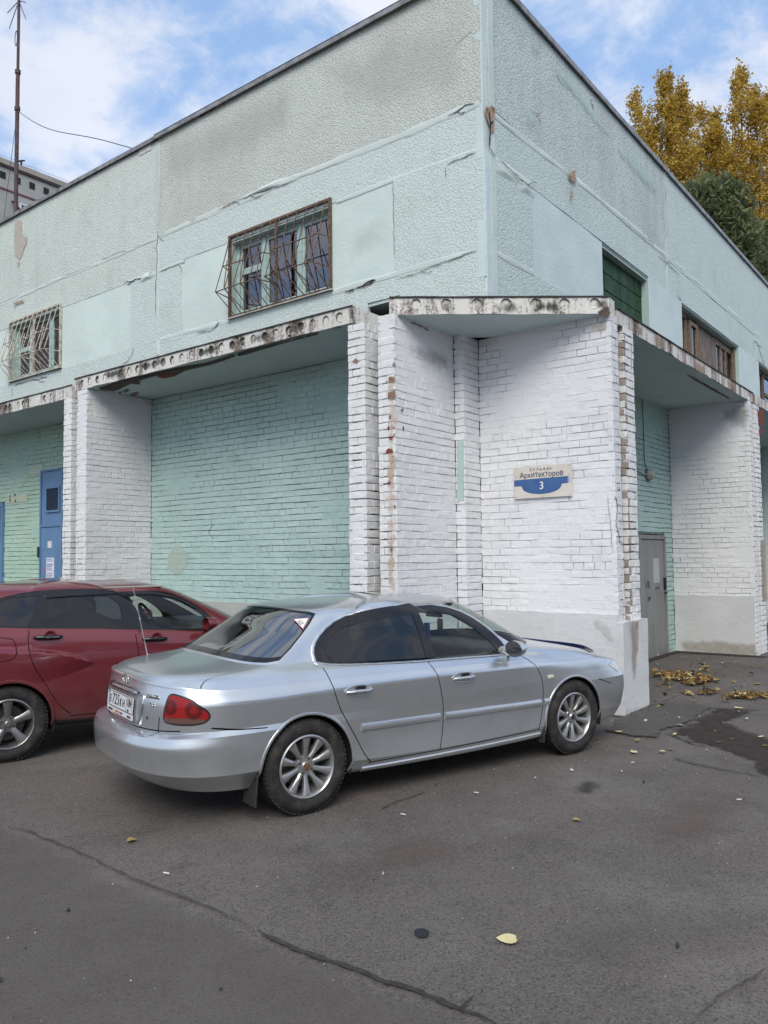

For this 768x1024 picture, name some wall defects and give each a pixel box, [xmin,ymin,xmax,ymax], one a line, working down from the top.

peeling [14,220,27,267]
spalling [100,333,319,398]
rust [387,405,395,588]